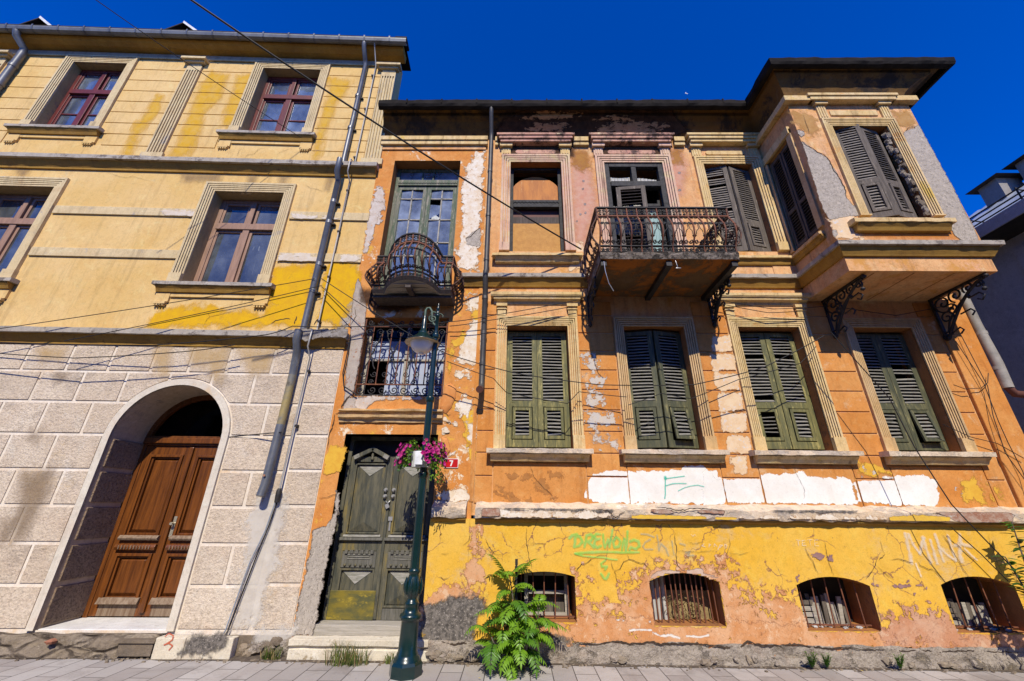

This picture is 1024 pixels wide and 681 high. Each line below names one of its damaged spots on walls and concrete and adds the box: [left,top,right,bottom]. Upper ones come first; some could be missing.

peeling [340,185,386,262]
peeling [453,150,487,273]
spalling [792,110,864,240]
spalling [881,110,978,240]
peeling [446,292,482,380]
peeling [323,445,349,475]
peeling [441,393,477,460]
peeling [579,350,622,453]
peeling [709,334,752,475]
spalling [293,490,340,636]
peeling [419,470,613,622]
peeling [503,551,1024,658]